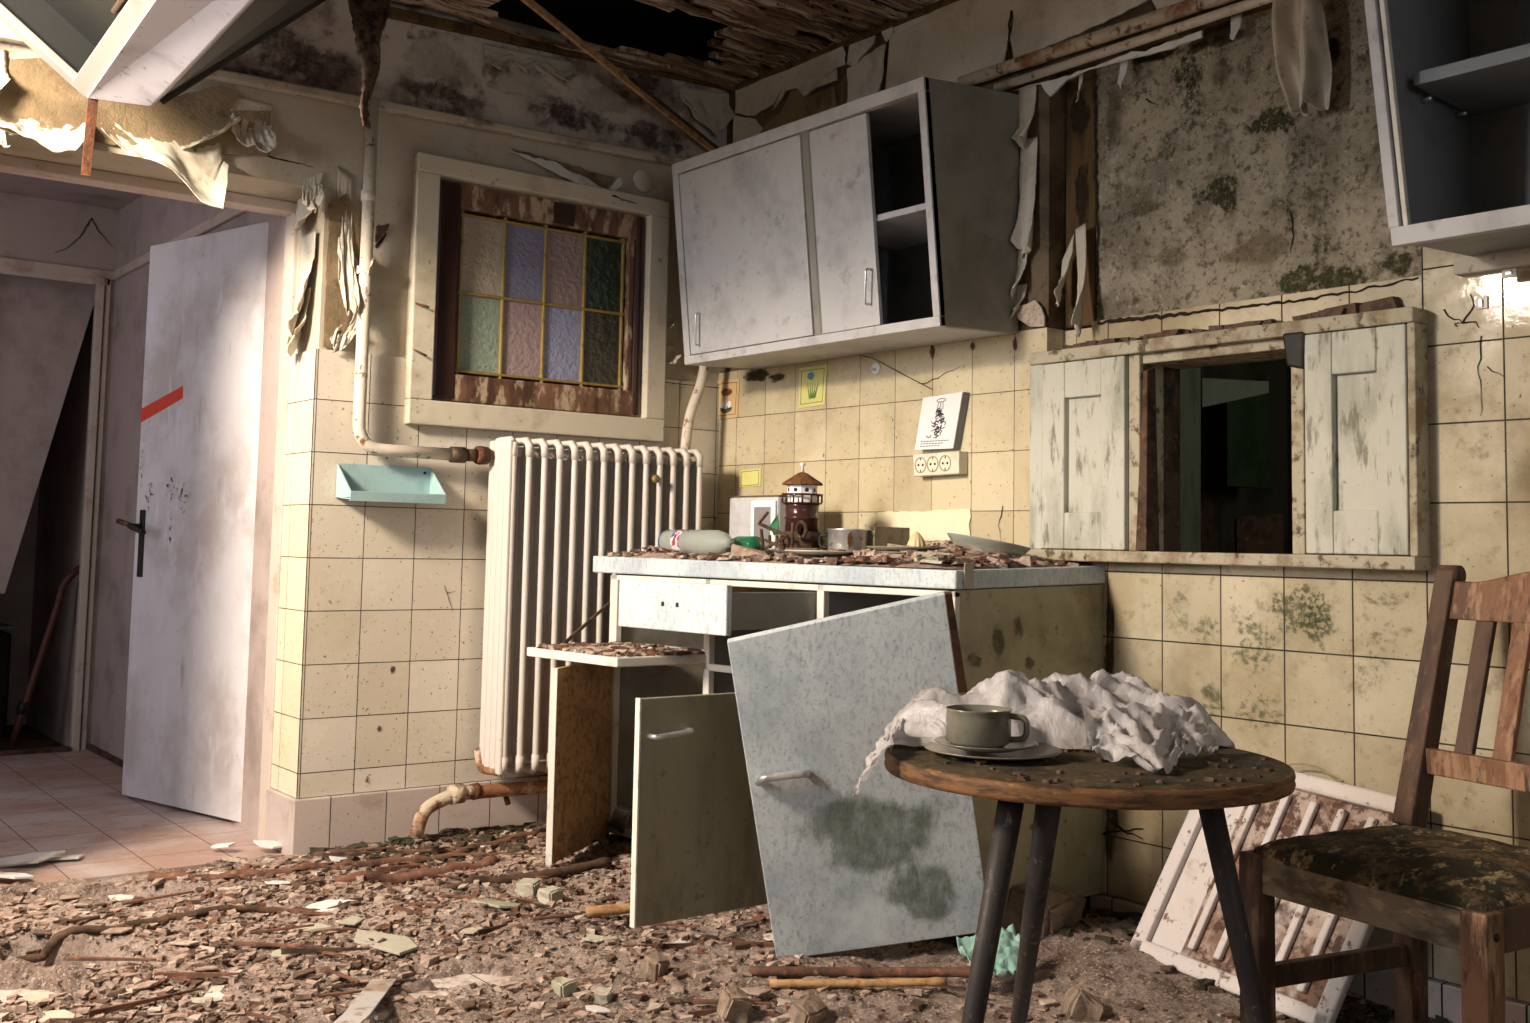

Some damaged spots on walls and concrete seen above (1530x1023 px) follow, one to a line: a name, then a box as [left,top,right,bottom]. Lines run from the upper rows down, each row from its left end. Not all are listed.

damp [224,28,358,90]
damp [1131,21,1244,64]
damp [1328,37,1341,63]
spalling [0,58,271,155]
mould [408,81,481,116]
mould [529,97,683,153]
damp [1225,236,1283,261]
spalling [1015,300,1046,327]
damp [1104,601,1114,674]
damp [1105,809,1118,860]